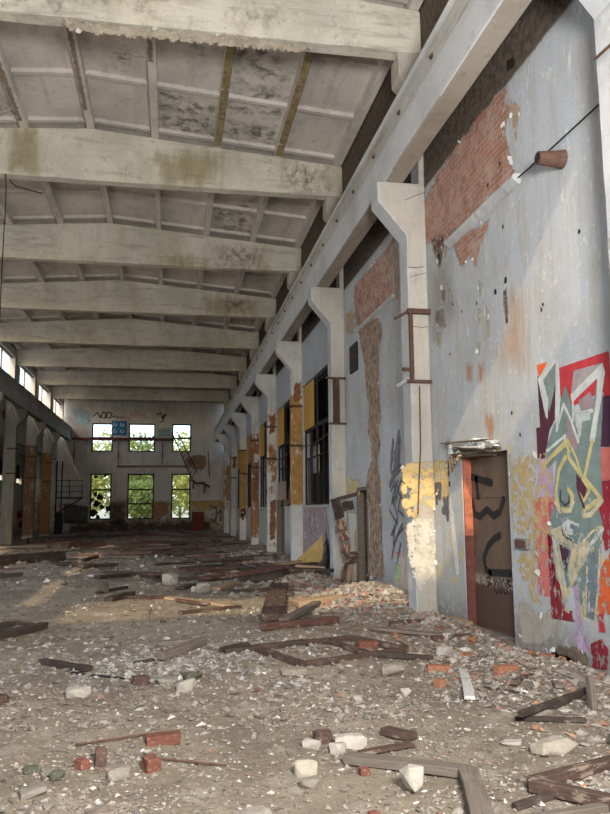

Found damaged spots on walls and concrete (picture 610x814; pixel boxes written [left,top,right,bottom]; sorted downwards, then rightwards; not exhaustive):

spalling [0,63,22,121]
spalling [64,17,312,111]
water stain [175,46,245,147]
water stain [270,52,315,157]
flaking render [425,87,520,270]
peeling [293,381,301,402]
flaking render [345,238,400,579]
peeling [508,451,588,665]